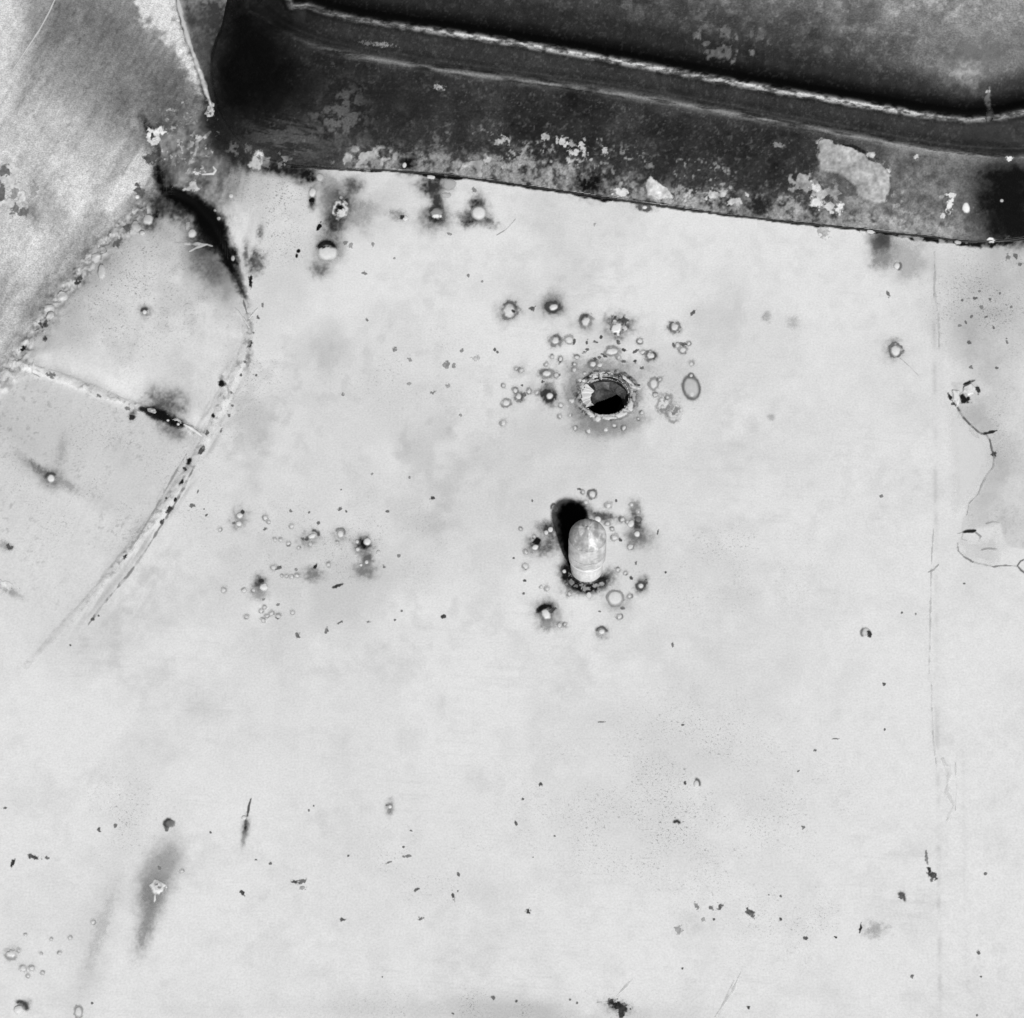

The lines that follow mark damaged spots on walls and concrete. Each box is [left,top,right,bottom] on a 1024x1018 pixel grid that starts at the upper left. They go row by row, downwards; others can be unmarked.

peeling [808,139,891,216]
crack [963,522,1024,573]